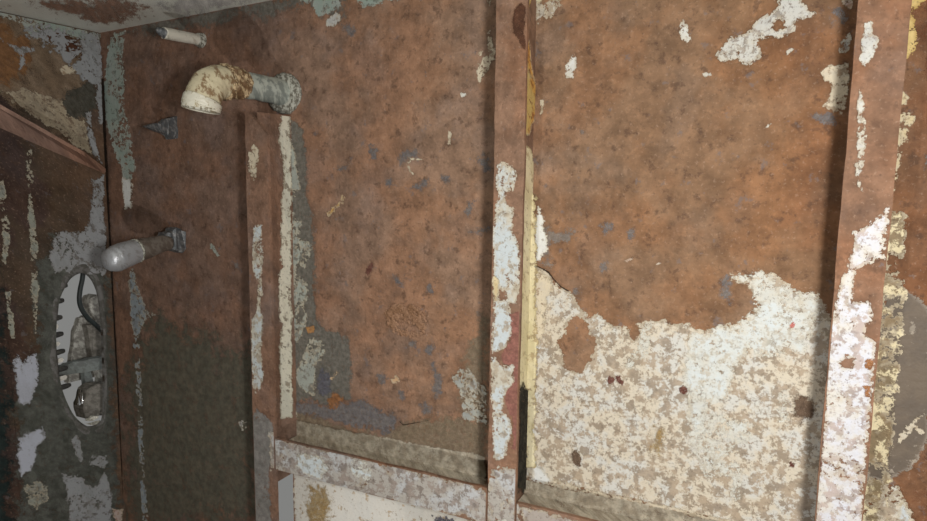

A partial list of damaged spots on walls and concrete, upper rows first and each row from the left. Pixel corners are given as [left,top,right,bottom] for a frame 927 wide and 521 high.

rust [25,0,152,26]
peeling [300,0,341,17]
peeling [357,0,398,8]
peeling [529,0,562,24]
peeling [715,0,817,67]
peeling [267,40,927,521]
peeling [251,224,264,393]
peeling [12,353,40,405]
peeling [16,427,49,510]